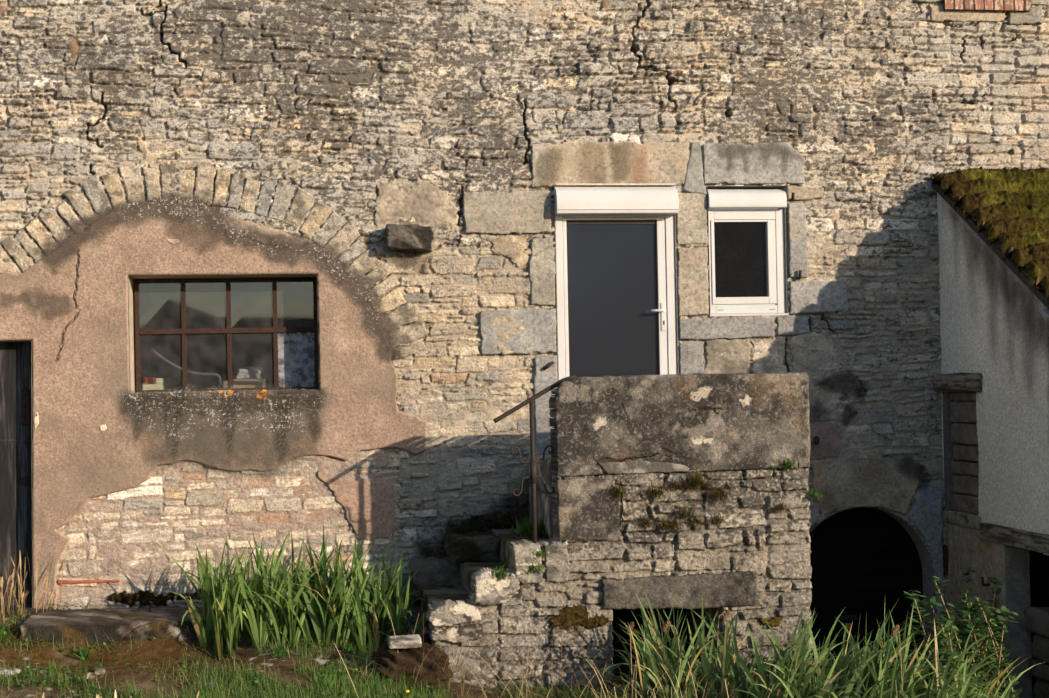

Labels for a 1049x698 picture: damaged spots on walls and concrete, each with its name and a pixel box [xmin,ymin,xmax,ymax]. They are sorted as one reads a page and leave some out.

crack [141,0,187,68]
crack [632,0,684,111]
crack [86,94,106,175]
leakage [3,292,71,319]
leakage [128,393,326,472]
flaking render [56,447,400,609]